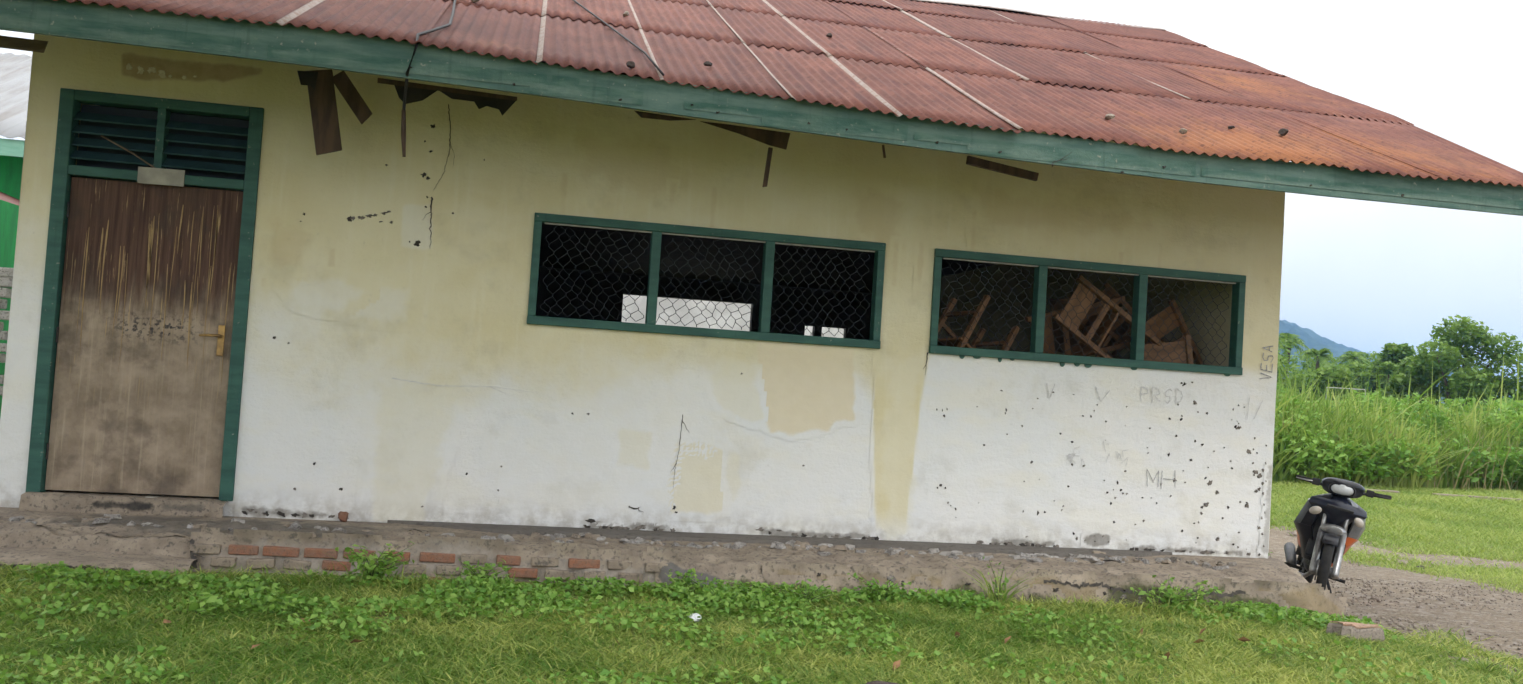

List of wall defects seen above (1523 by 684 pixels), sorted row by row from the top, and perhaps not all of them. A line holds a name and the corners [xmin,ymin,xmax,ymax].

peeling [187,342,1273,591]